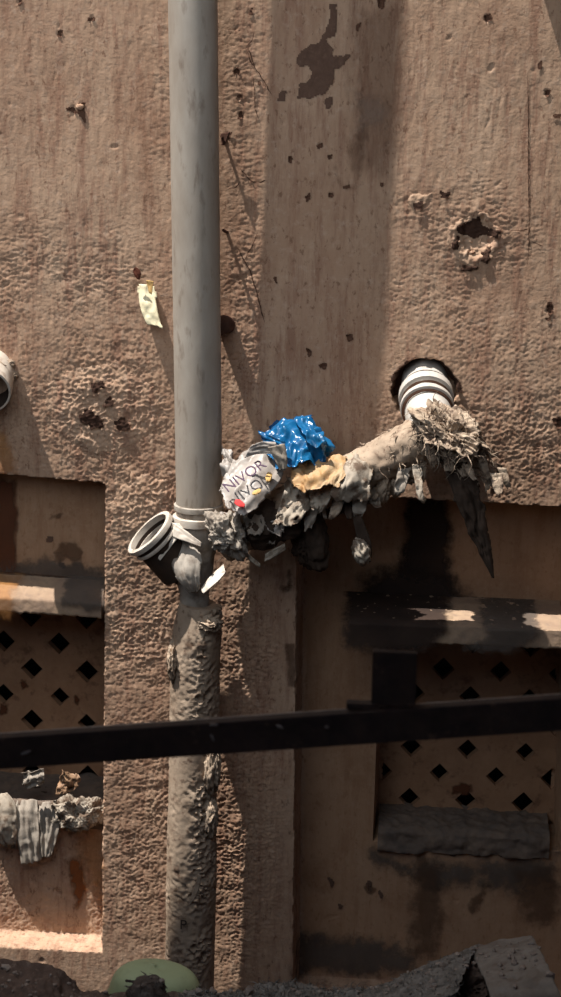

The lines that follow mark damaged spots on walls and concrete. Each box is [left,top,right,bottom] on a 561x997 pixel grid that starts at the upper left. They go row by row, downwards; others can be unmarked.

spalling [448,212,501,271]
rust [0,479,18,575]
leakage [342,498,466,652]
leakage [469,597,539,653]
leakage [295,850,554,981]